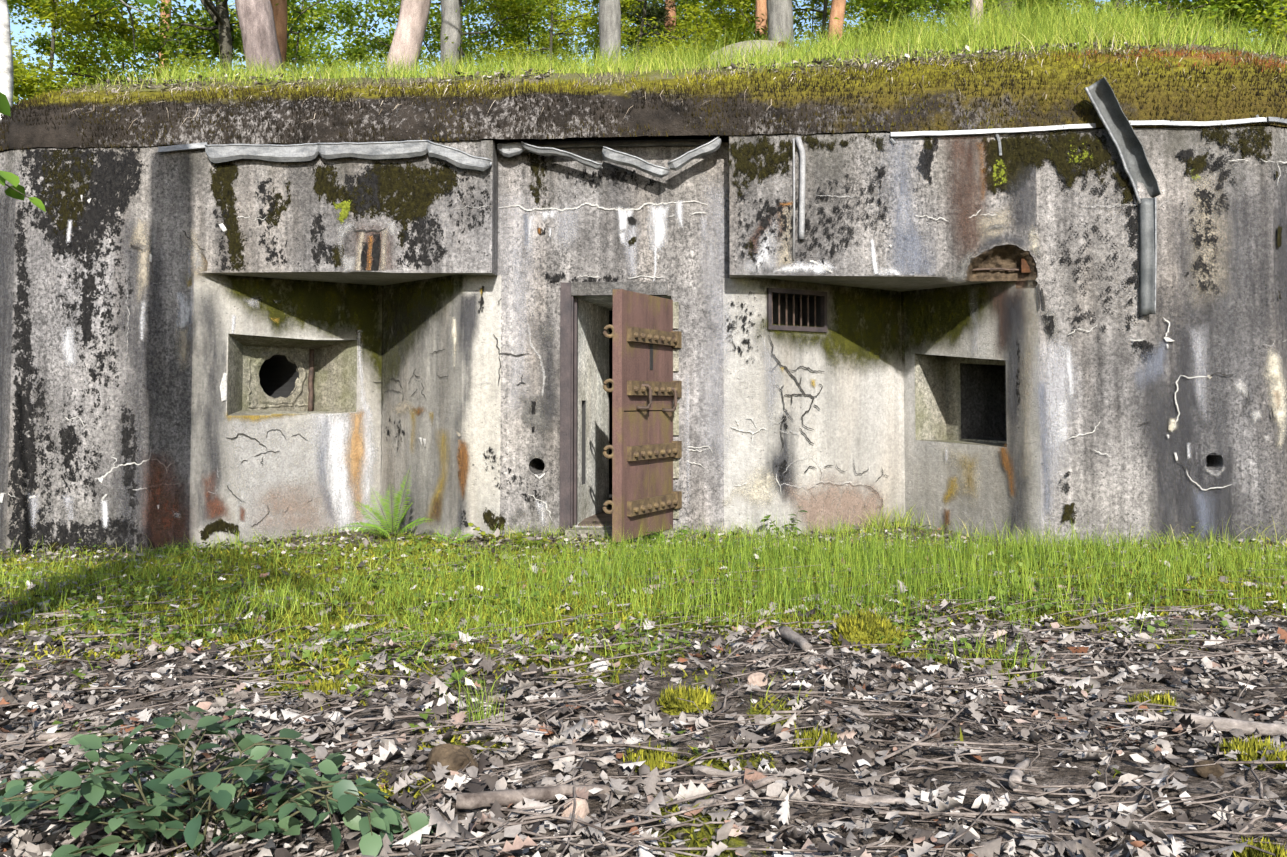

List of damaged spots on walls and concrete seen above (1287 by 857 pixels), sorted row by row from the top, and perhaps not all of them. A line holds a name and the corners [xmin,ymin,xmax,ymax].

rust [356,231,389,270]
damp [781,260,832,273]
damp [871,150,929,275]
damp [952,136,980,249]
damp [1150,197,1287,542]
rust [148,459,186,549]
crack [95,429,312,527]
rust [348,413,364,511]
rust [430,433,468,527]
crack [686,335,887,517]